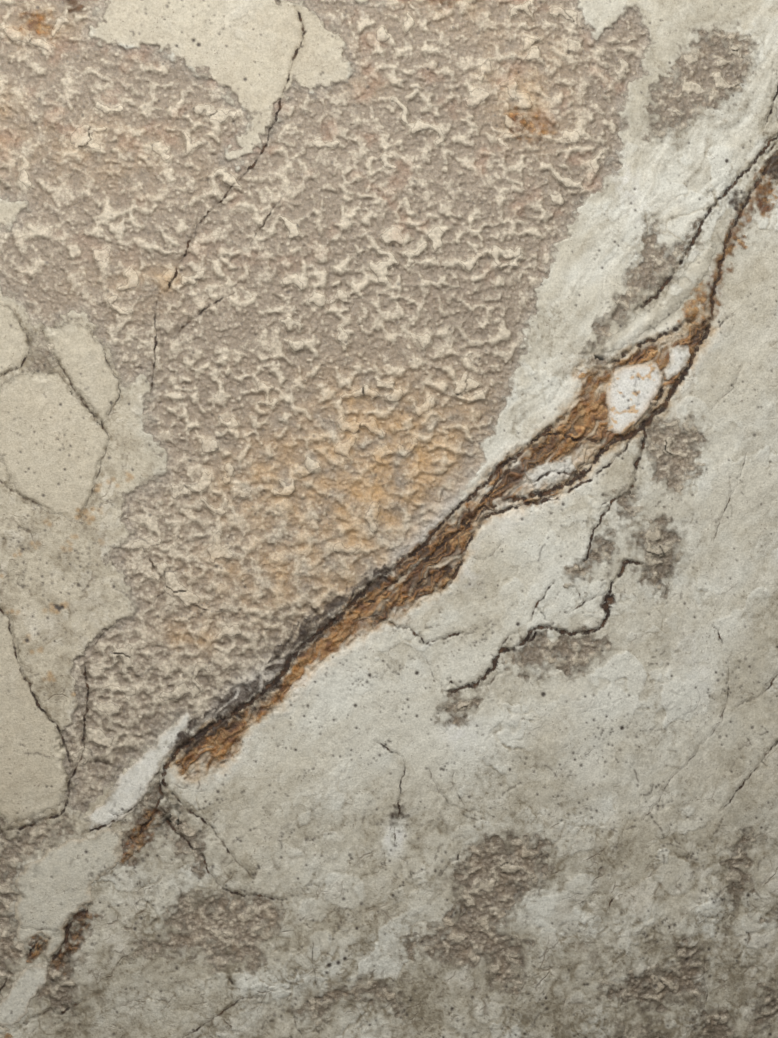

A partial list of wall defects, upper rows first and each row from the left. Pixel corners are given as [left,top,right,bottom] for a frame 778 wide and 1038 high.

crack [168,12,305,288]
corrosion [508,112,547,134]
flaking render [0,0,650,813]
crack [90,86,778,900]
corrosion [175,151,778,774]
crack [0,608,96,830]
flaking render [0,712,192,1038]
flaking render [162,814,205,879]
flaking render [128,890,284,974]
flaking render [296,978,406,1027]
flaking render [404,834,553,996]